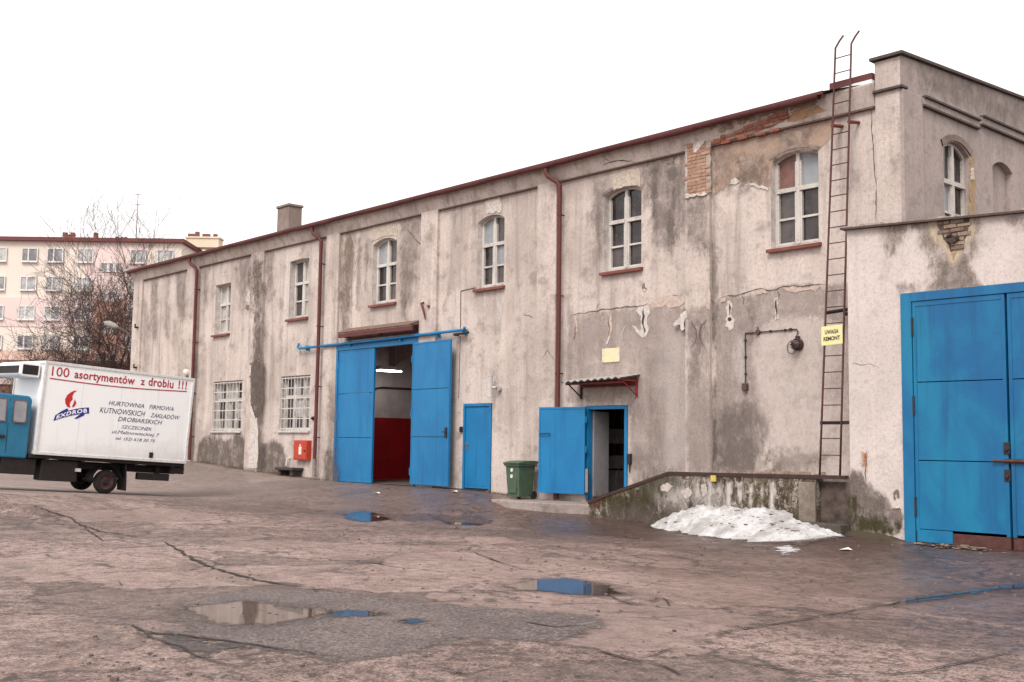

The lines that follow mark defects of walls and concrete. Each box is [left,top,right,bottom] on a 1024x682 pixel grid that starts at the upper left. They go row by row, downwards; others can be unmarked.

flaking render [683,105,832,198]
crack [870,113,878,216]
flaking render [928,156,976,266]
water stain [253,261,265,363]
flaking render [633,283,687,338]
flaking render [705,288,735,331]
crack [720,284,820,303]
water stain [197,413,287,473]
water stain [609,482,776,524]
water stain [847,471,903,532]